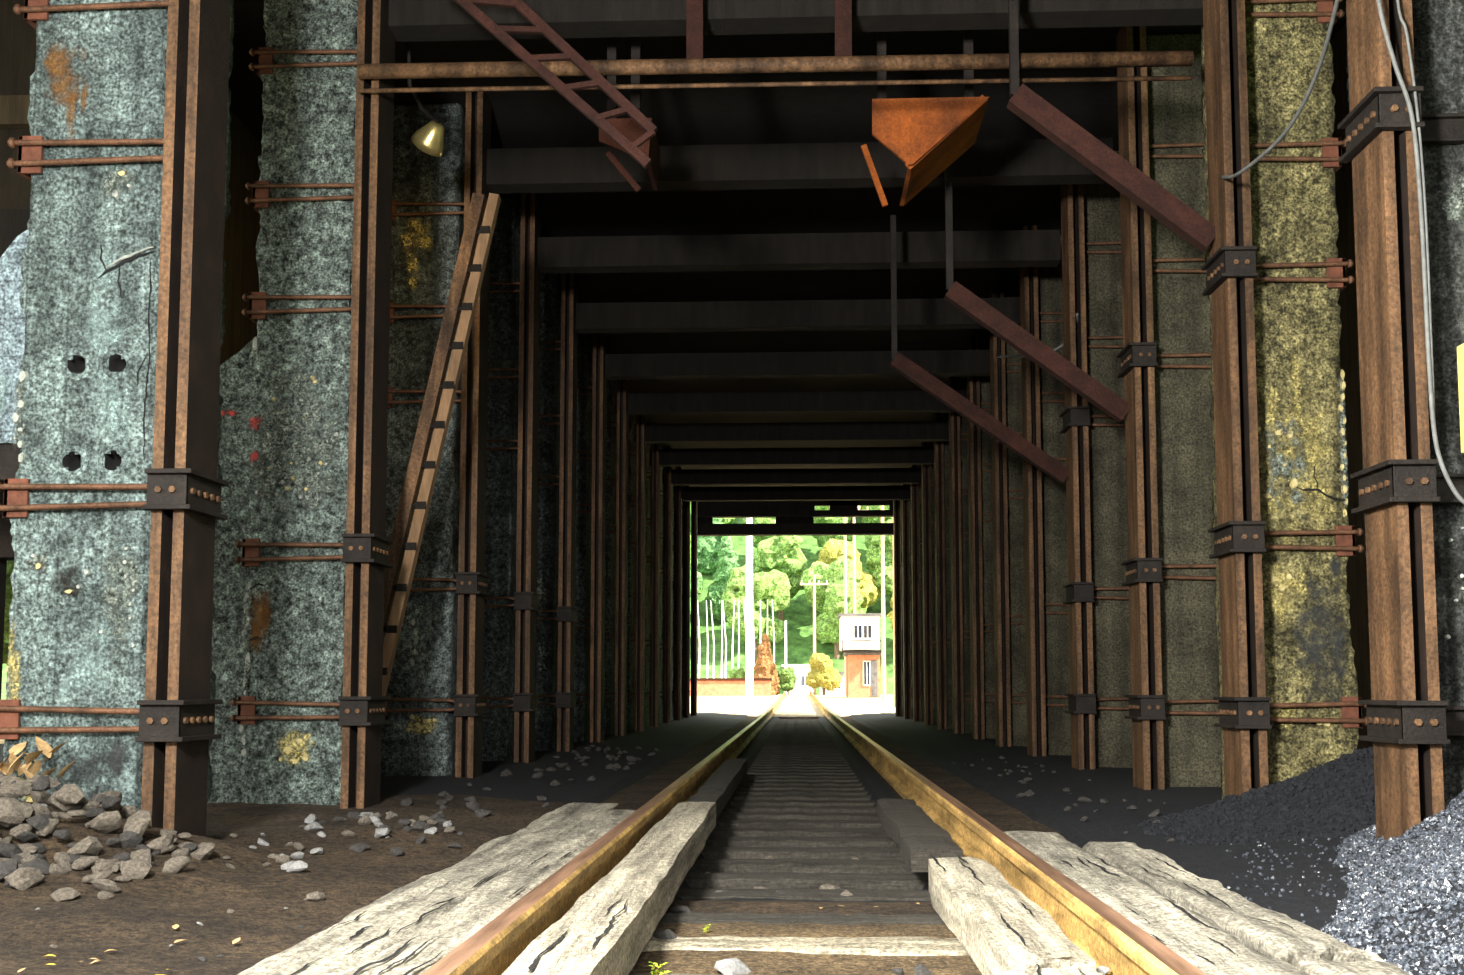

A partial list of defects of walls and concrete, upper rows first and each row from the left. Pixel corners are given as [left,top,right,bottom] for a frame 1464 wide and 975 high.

rust [45,51,87,121]
damp [1258,357,1330,518]